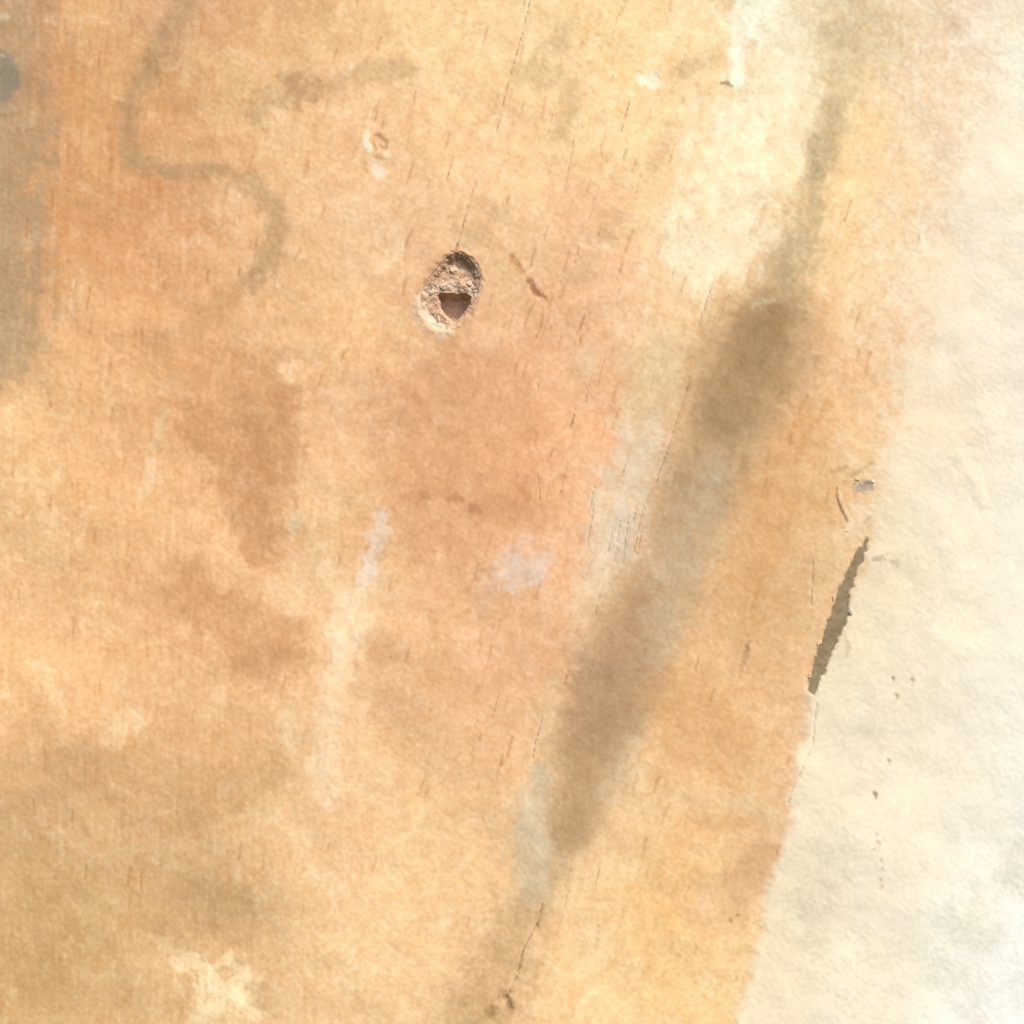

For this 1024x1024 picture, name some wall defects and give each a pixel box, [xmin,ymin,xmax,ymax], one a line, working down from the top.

leakage [143,0,282,161]
spalling [411,249,484,343]
leakage [335,0,945,1024]